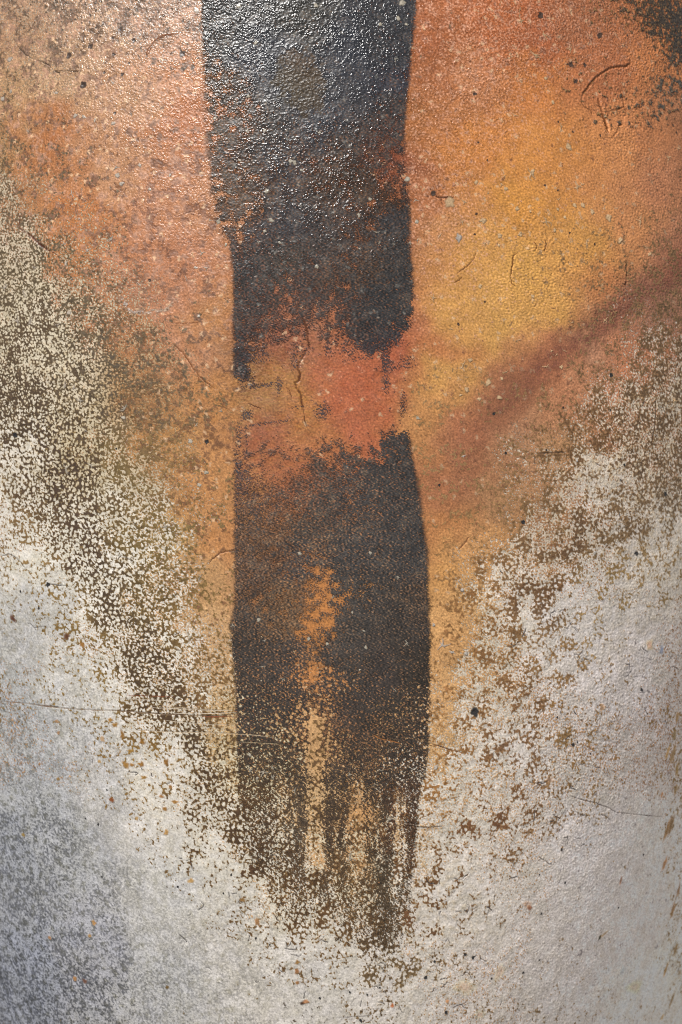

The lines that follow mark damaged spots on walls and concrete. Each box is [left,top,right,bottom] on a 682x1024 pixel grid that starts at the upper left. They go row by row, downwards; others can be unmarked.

leakage [2,0,421,388]
crack [290,319,310,423]
leakage [0,673,64,725]
corrosion [0,659,83,790]
leakage [118,779,163,852]
corrosion [418,823,555,1024]
leakage [453,846,531,942]
leakage [436,985,615,1024]